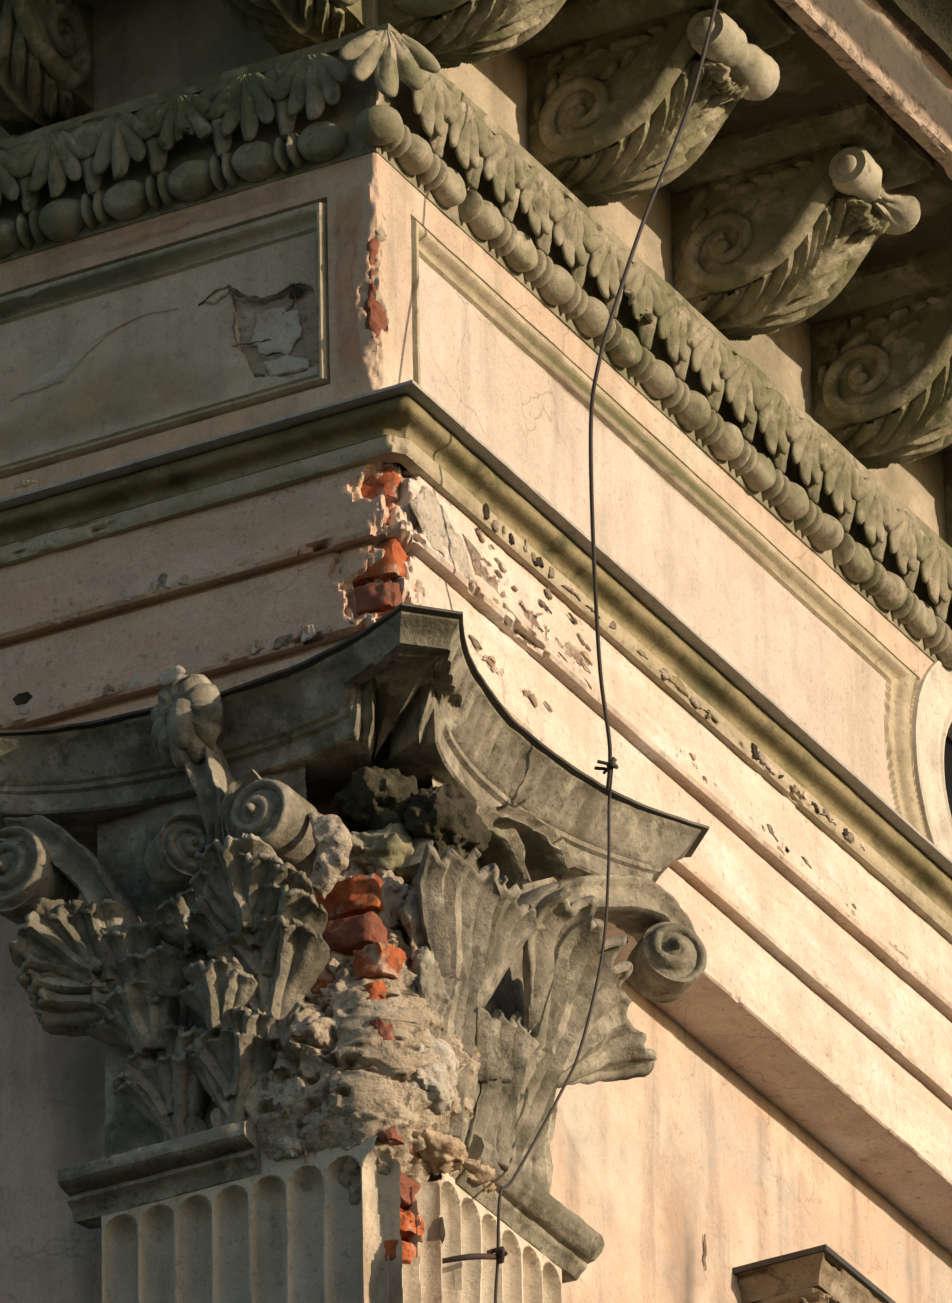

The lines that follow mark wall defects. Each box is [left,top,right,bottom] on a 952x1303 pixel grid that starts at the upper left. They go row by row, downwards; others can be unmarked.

flaking render [198,283,320,378]
spalling [364,212,388,364]
spalling [350,468,617,690]
flaking render [250,624,334,655]
peeling [524,688,553,712]
flaking render [636,649,719,724]
spalling [242,766,497,1264]
spalling [210,1098,226,1128]